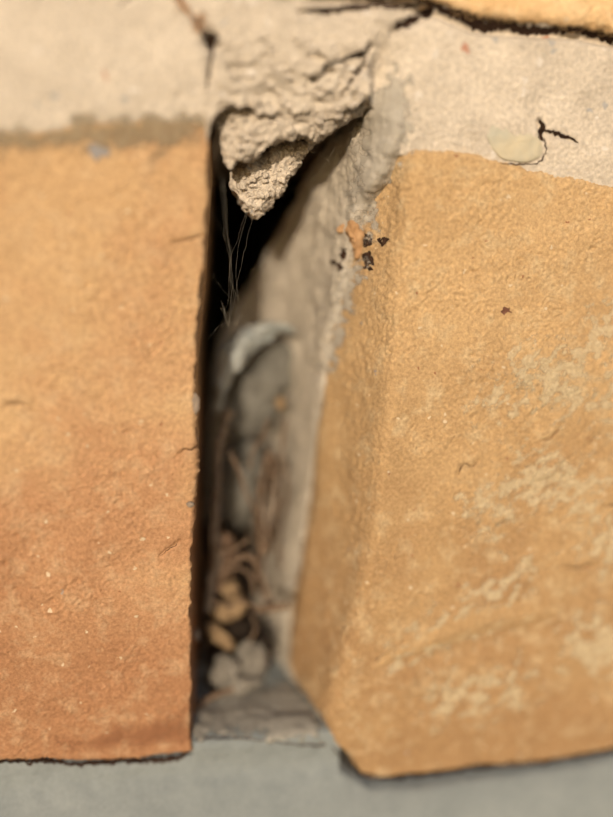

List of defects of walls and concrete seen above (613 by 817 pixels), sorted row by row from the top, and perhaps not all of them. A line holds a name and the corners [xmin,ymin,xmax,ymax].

crack [206,44,215,91]
crack [499,119,579,166]
peeling [258,31,415,373]